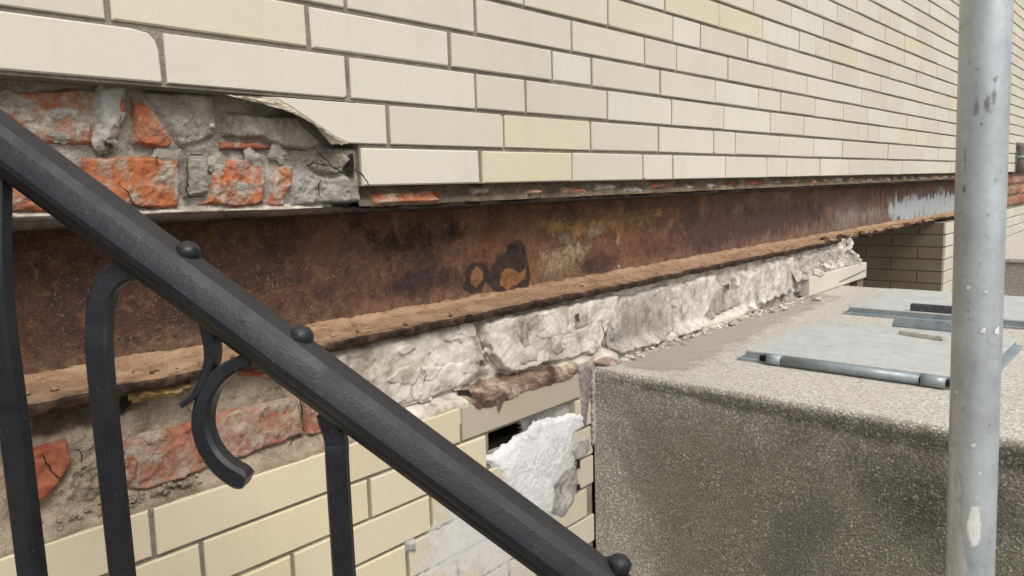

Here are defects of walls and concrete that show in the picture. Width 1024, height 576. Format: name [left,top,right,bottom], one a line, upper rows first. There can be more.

spalling [0,80,387,215]
spalling [12,188,55,221]
rust [464,205,681,292]
rust [820,203,898,243]
peeling [869,186,955,222]
spalling [0,446,14,558]
spalling [29,393,103,544]
spalling [118,378,226,515]
spalling [216,369,325,475]
peeling [323,236,862,517]